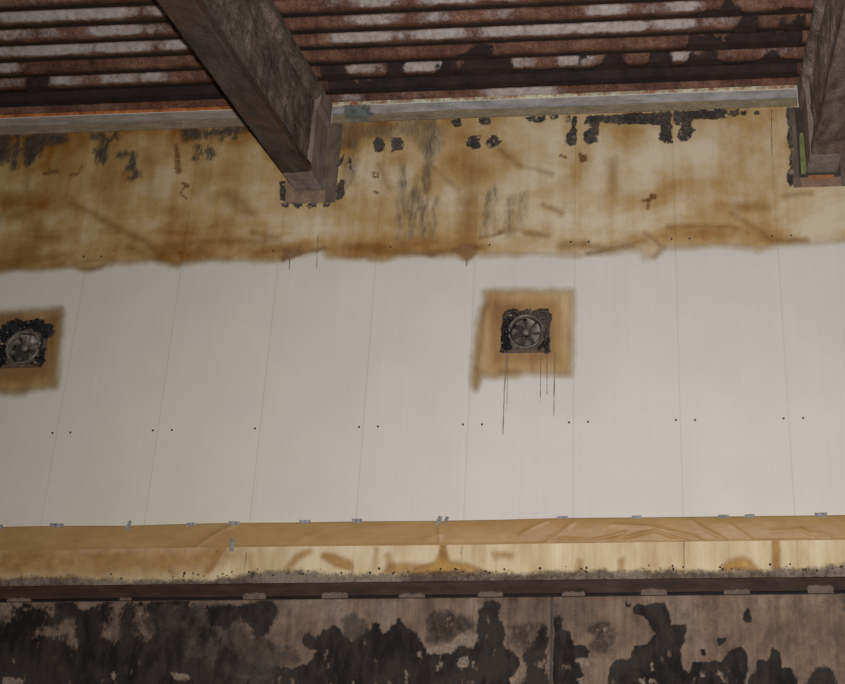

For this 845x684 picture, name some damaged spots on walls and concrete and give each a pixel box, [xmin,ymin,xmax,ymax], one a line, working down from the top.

damp [116,152,138,180]
damp [0,547,226,574]
damp [324,554,351,568]
damp [384,545,482,574]
damp [723,559,756,570]